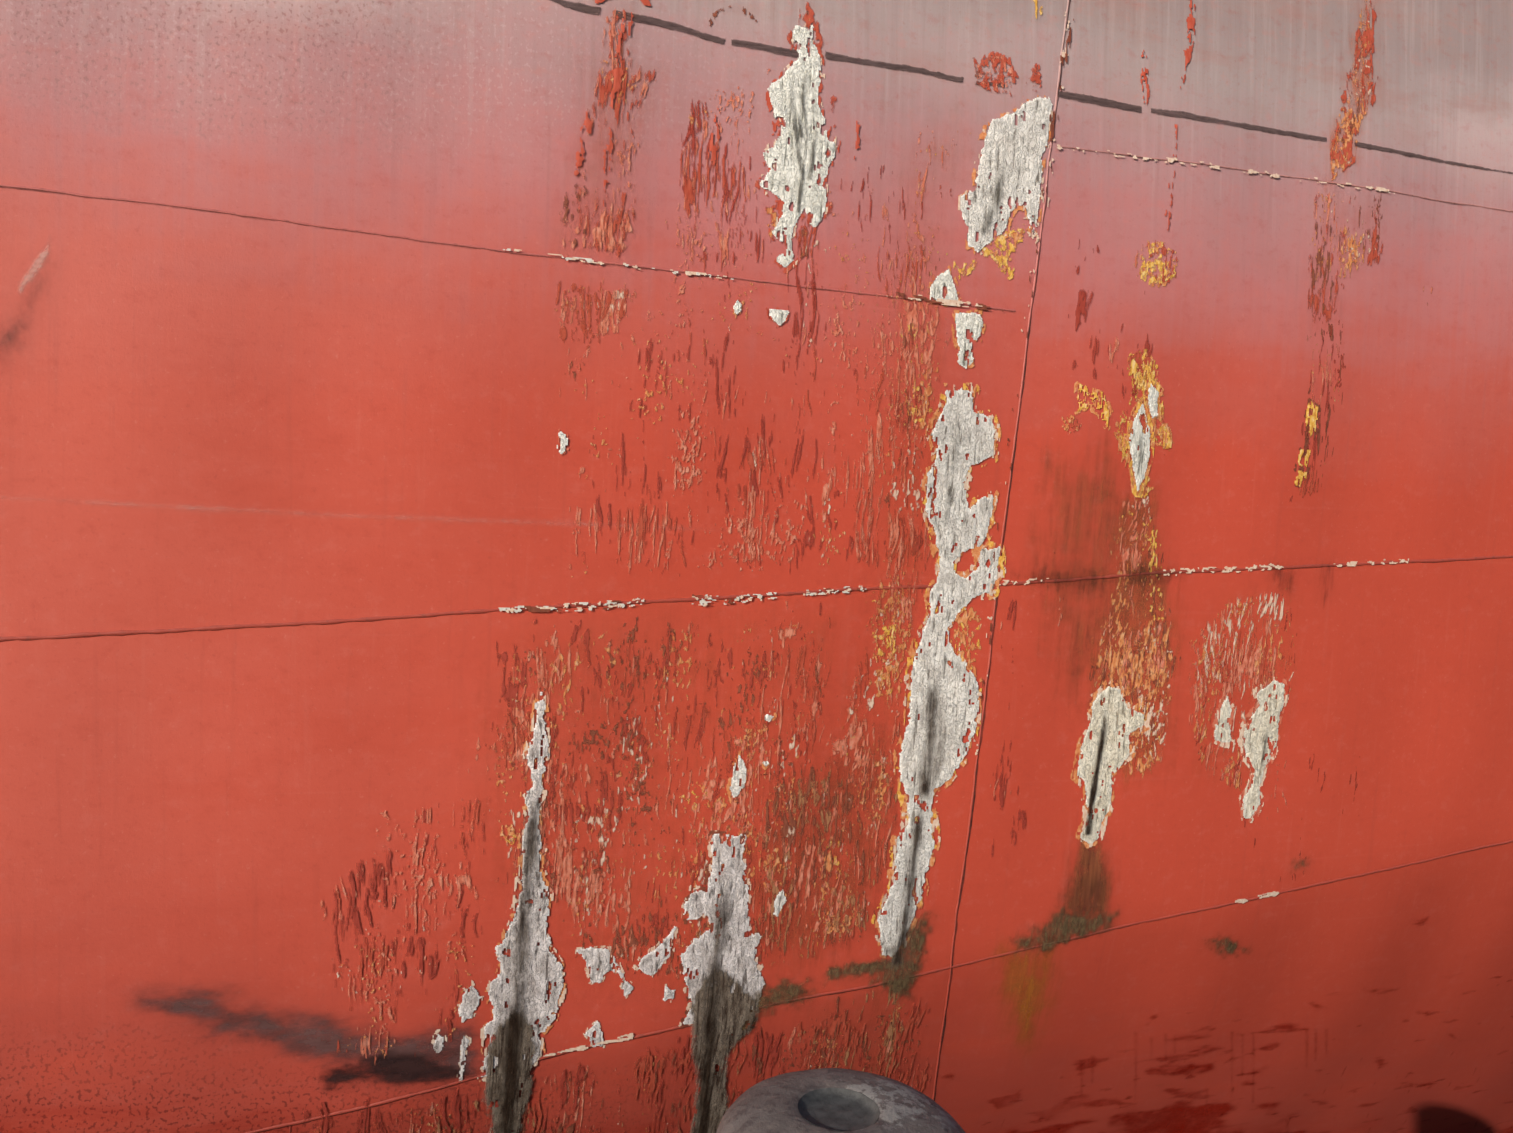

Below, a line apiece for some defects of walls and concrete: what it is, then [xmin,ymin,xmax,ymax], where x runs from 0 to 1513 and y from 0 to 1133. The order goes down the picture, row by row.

corrosion [560,9,655,257]
peeling [755,23,841,273]
corrosion [787,2,825,79]
corrosion [1291,0,1383,501]
corrosion [468,86,951,979]
peeling [871,86,1220,963]
spalling [1163,563,1284,576]
peeling [1212,677,1289,823]
corrosion [320,798,485,1062]
peeling [431,692,770,1133]
peeling [770,889,787,917]
corrosion [519,987,932,1133]